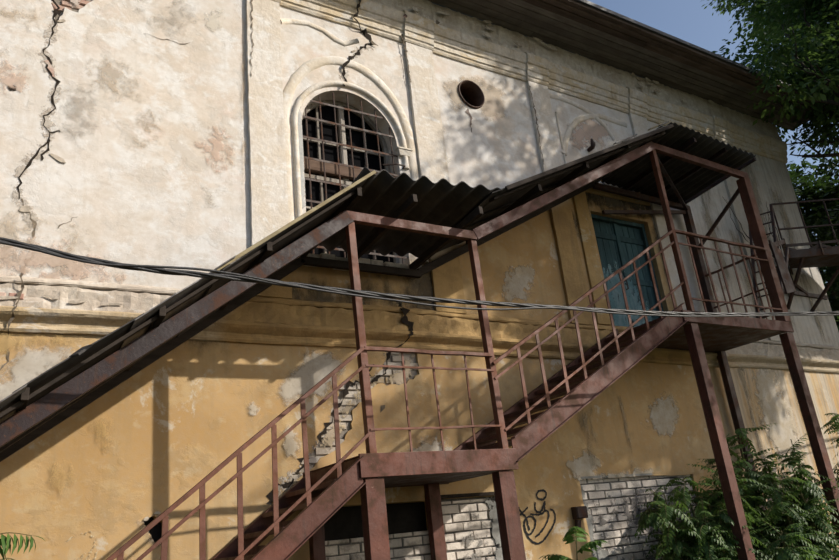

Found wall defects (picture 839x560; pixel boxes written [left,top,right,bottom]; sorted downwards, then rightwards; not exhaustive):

spalling [51,0,93,24]
crack [341,0,378,87]
crack [12,0,66,237]
crack [0,265,26,370]
flaking render [0,347,71,401]
flaking render [279,352,346,406]
spalling [280,381,361,487]
crack [266,302,414,502]
spalling [370,352,418,389]
flaking render [647,395,679,438]
flaking render [566,451,653,481]